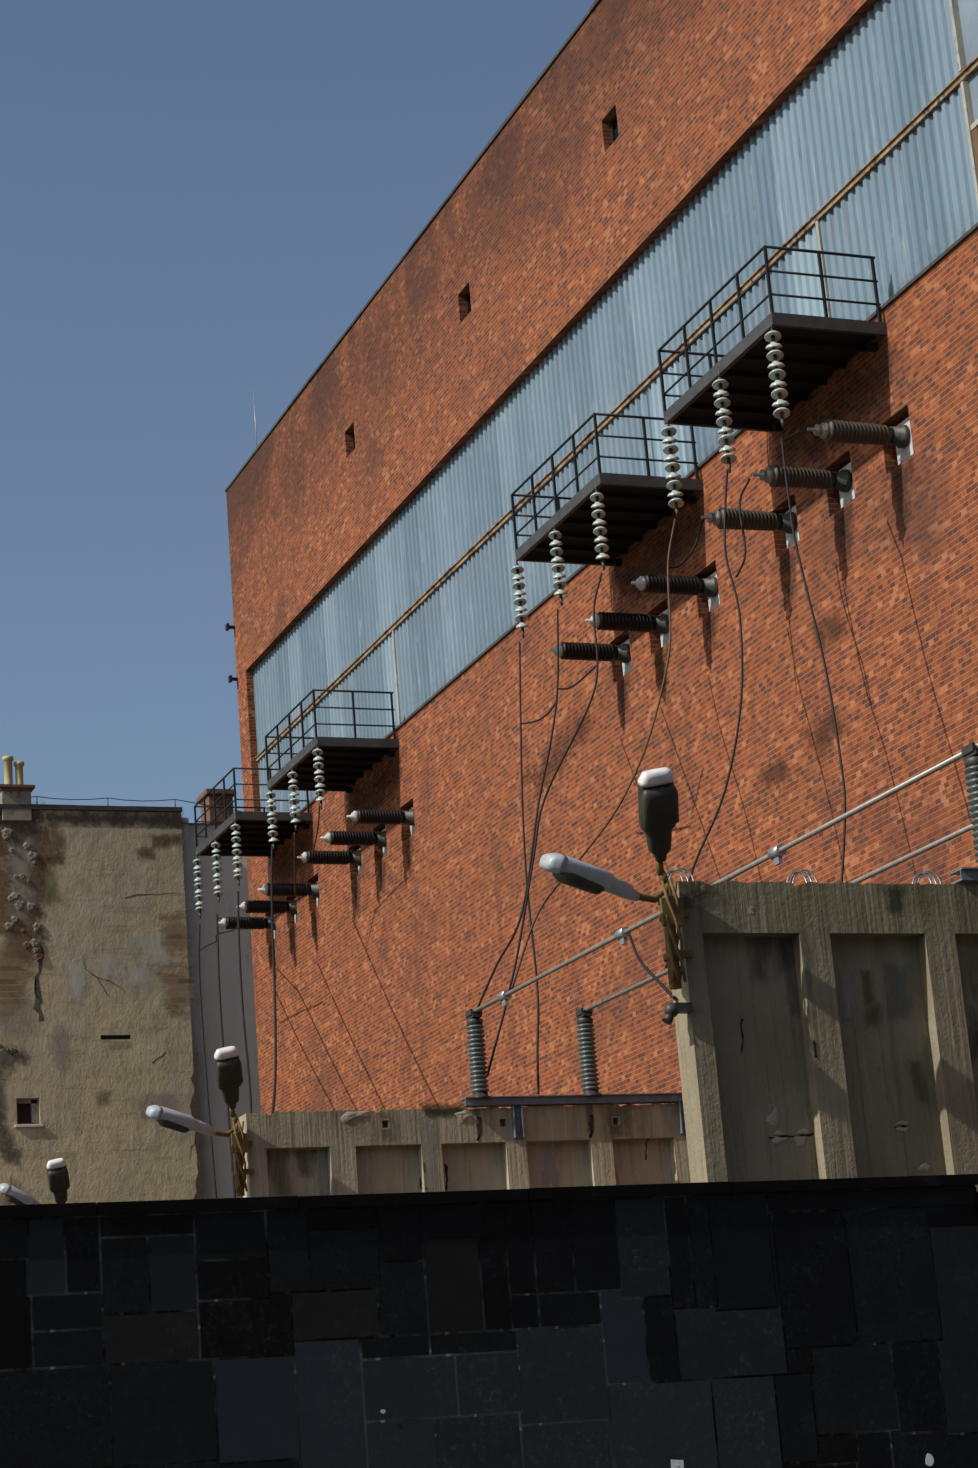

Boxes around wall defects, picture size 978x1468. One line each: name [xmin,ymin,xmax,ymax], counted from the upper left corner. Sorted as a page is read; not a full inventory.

peeling [0,817,44,963]
crack [33,944,44,1022]
crack [82,956,125,997]
spalling [0,1043,27,1165]